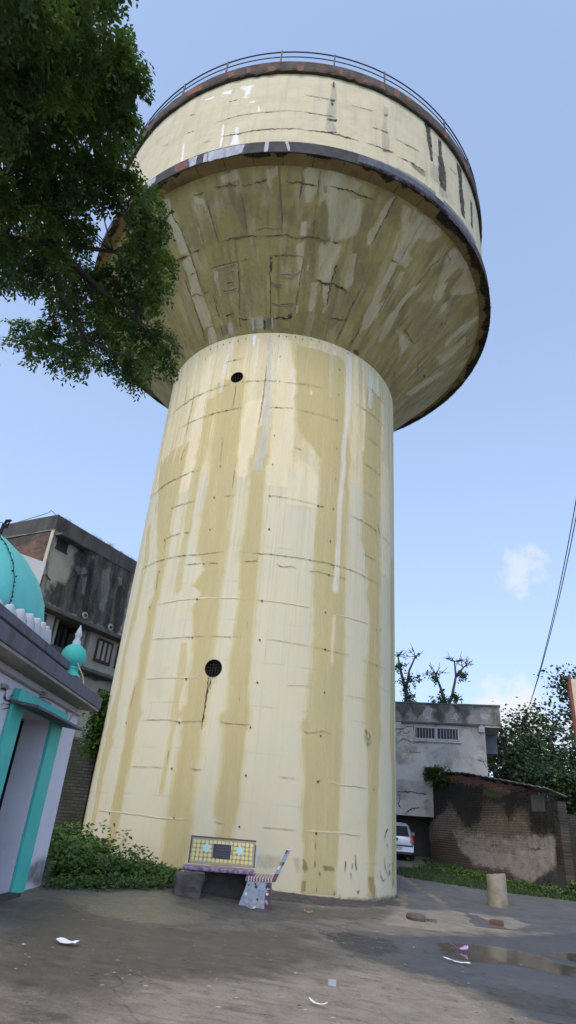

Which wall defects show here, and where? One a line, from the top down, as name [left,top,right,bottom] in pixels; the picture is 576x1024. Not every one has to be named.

crack [171,165,451,376]
water stain [43,123,492,901]
crack [130,676,250,729]
water stain [428,778,557,838]